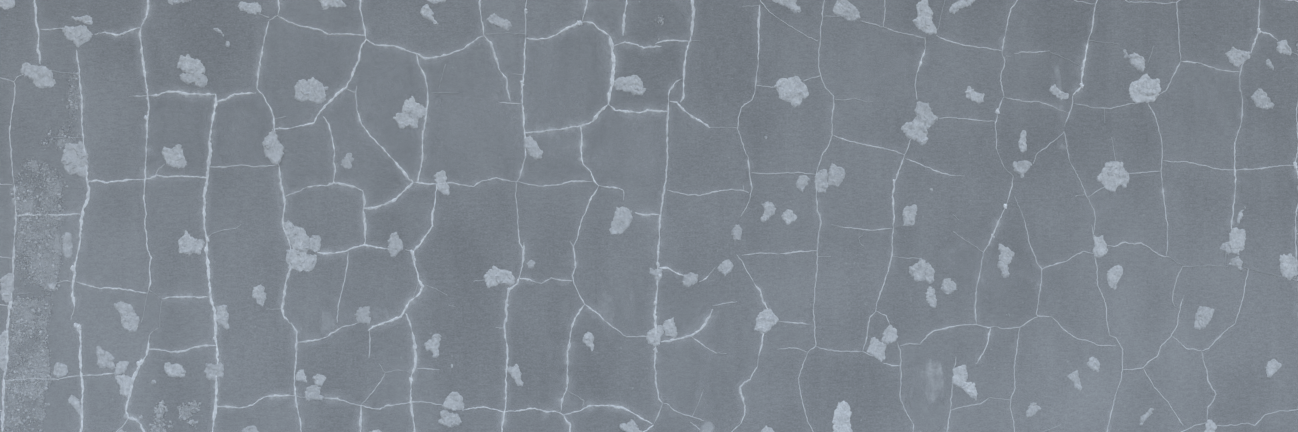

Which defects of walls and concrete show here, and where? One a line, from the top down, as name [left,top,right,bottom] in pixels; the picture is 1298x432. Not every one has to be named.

spalling [177,54,208,88]
spalling [294,77,328,104]
spalling [774,76,809,107]
spalling [1123,49,1162,104]
spalling [393,96,428,129]
spalling [901,101,938,145]
spalling [1097,161,1129,192]
crack [0,0,960,432]
crack [862,0,1298,432]
spalling [283,220,321,272]
spalling [438,392,464,428]
spalling [832,401,853,432]